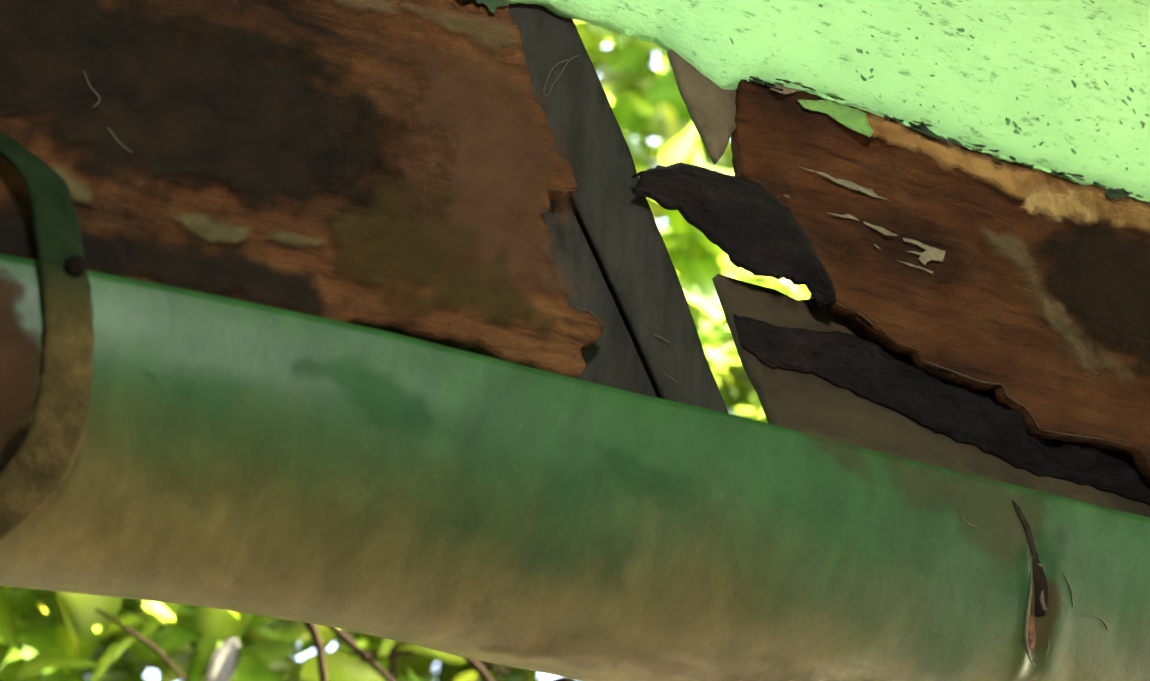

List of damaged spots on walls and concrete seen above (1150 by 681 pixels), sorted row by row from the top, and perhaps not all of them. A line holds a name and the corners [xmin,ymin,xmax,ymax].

peeling [464,0,510,13]
spalling [1071,57,1150,129]
peeling [746,76,1150,203]
peeling [825,212,946,274]
crack [1012,500,1108,665]